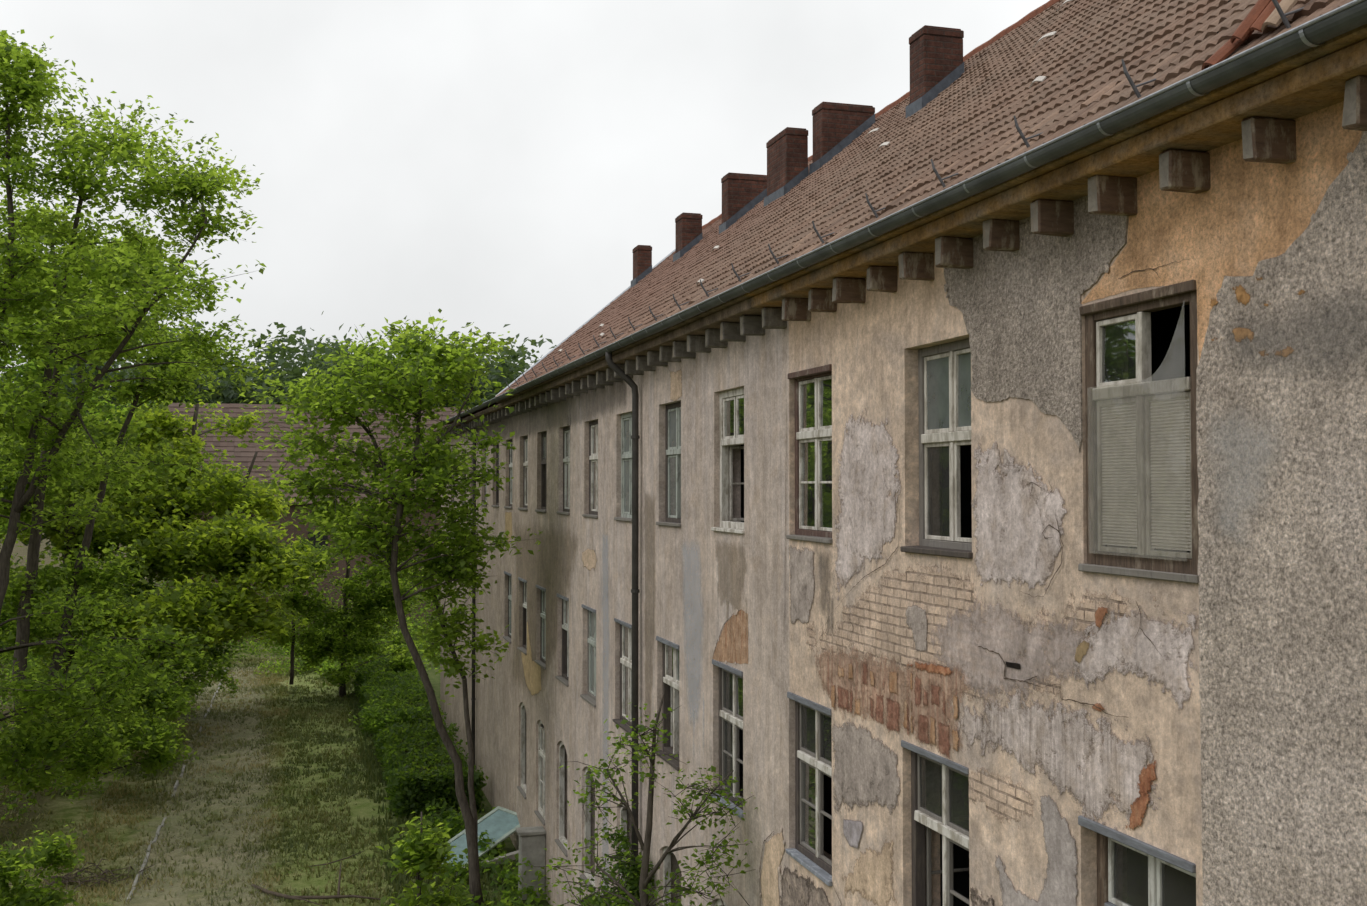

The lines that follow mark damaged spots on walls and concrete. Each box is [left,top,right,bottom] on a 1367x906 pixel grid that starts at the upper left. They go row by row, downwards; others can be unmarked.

spalling [1081,101,1362,361]
crack [1118,259,1189,279]
flaking render [713,609,748,664]
peeling [806,408,1199,830]
crack [978,646,1125,717]
spalling [758,827,896,906]
spalling [970,883,994,906]